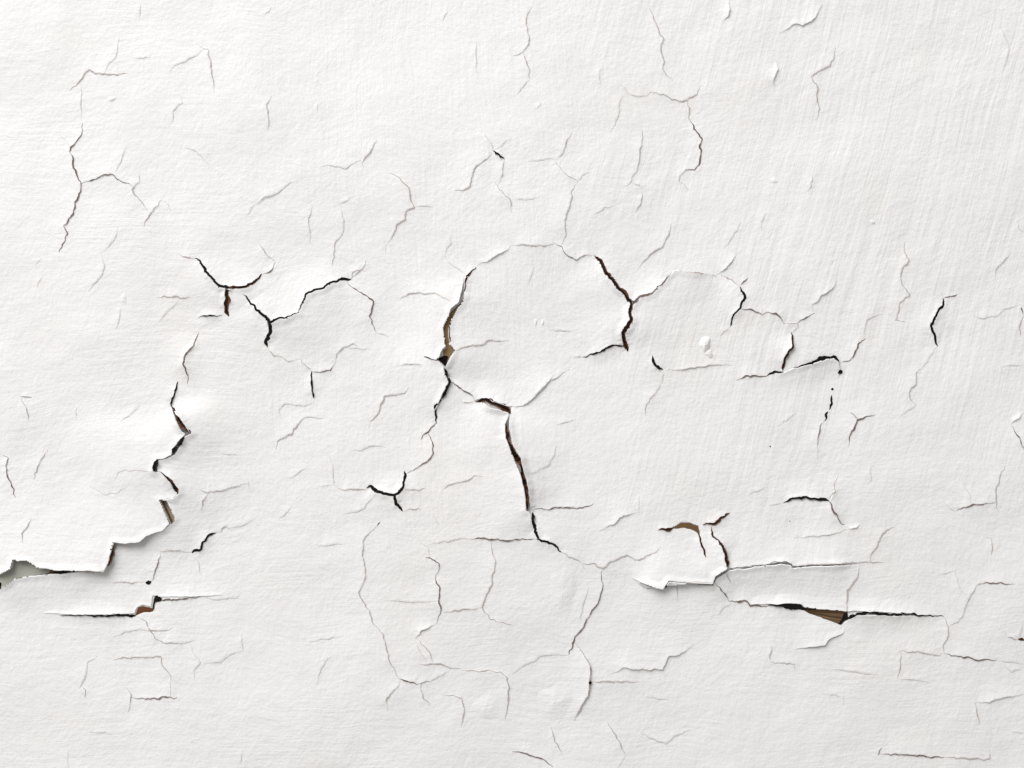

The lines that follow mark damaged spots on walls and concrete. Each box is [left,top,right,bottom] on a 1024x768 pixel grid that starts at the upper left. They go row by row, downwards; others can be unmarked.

peeling [0,249,359,624]
crack [89,173,431,523]
crack [285,130,1024,767]
peeling [621,474,918,650]